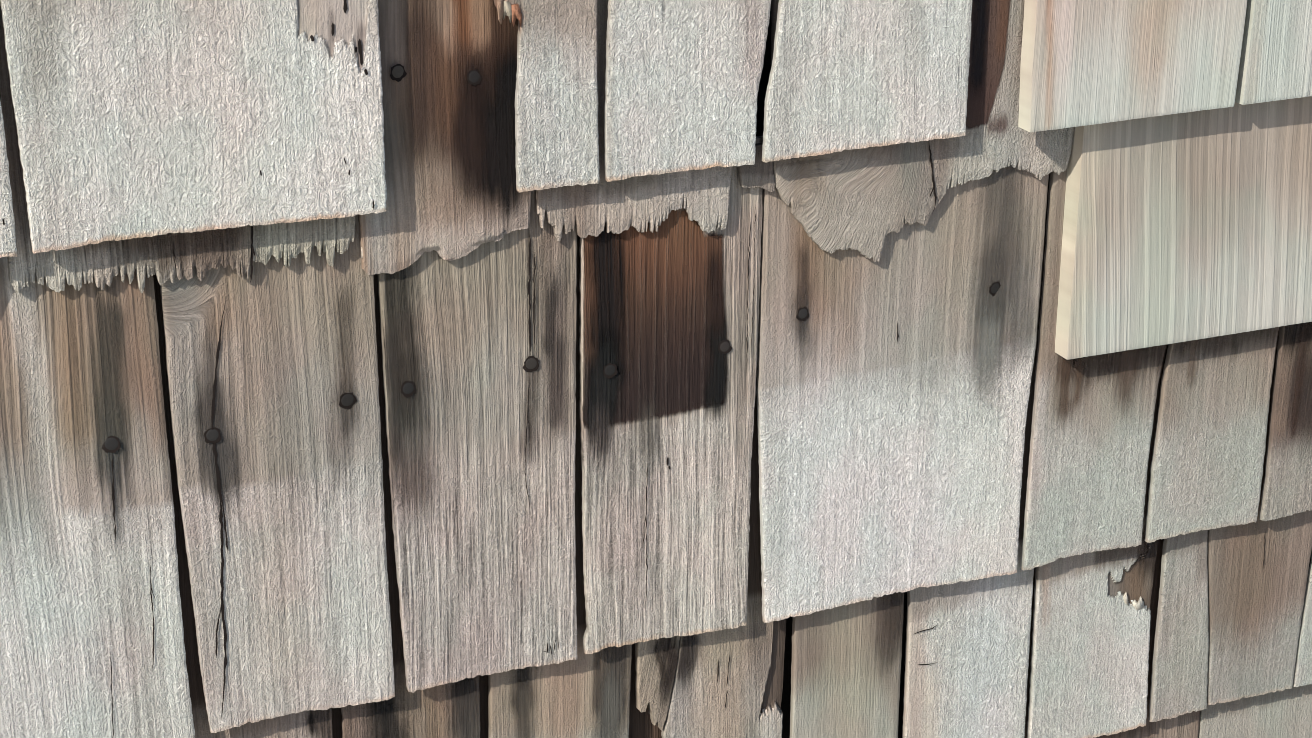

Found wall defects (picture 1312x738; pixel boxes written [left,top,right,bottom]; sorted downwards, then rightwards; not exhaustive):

damp [454,47,526,218]
damp [582,209,727,451]
damp [977,165,1026,375]
crack [211,226,255,718]
spalling [1108,548,1154,610]